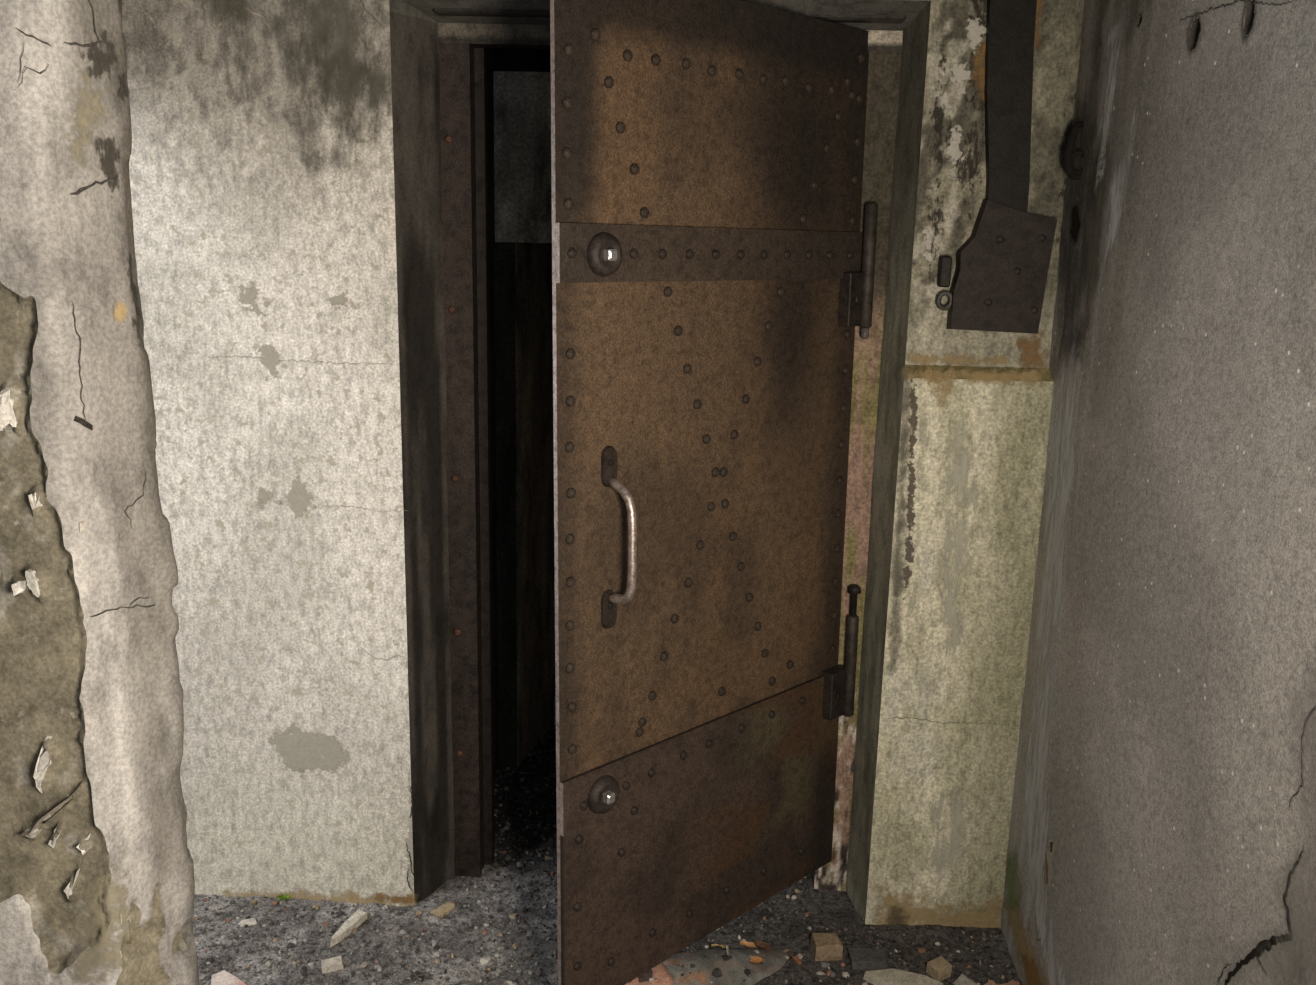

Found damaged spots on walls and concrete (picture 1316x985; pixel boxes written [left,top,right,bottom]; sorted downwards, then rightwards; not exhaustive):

flaking render [83,30,130,100]
flaking render [95,138,120,191]
damp [211,0,251,24]
damp [285,0,387,169]
damp [926,45,952,254]
spalling [930,18,986,172]
flaking render [127,256,141,334]
spalling [920,225,938,261]
damp [935,421,979,666]
flaking render [0,282,112,974]
crack [1289,705,1316,811]
crack [1217,847,1304,985]